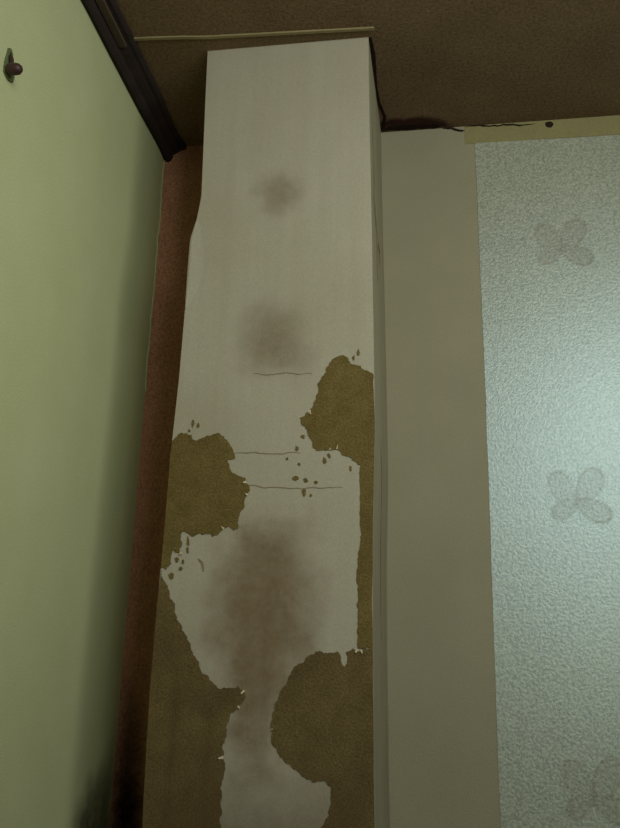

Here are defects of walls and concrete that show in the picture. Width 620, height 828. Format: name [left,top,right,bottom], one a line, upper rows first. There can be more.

crack [368,37,535,277]
flaking render [109,145,204,828]
peeling [355,450,374,653]
peeling [321,762,375,828]